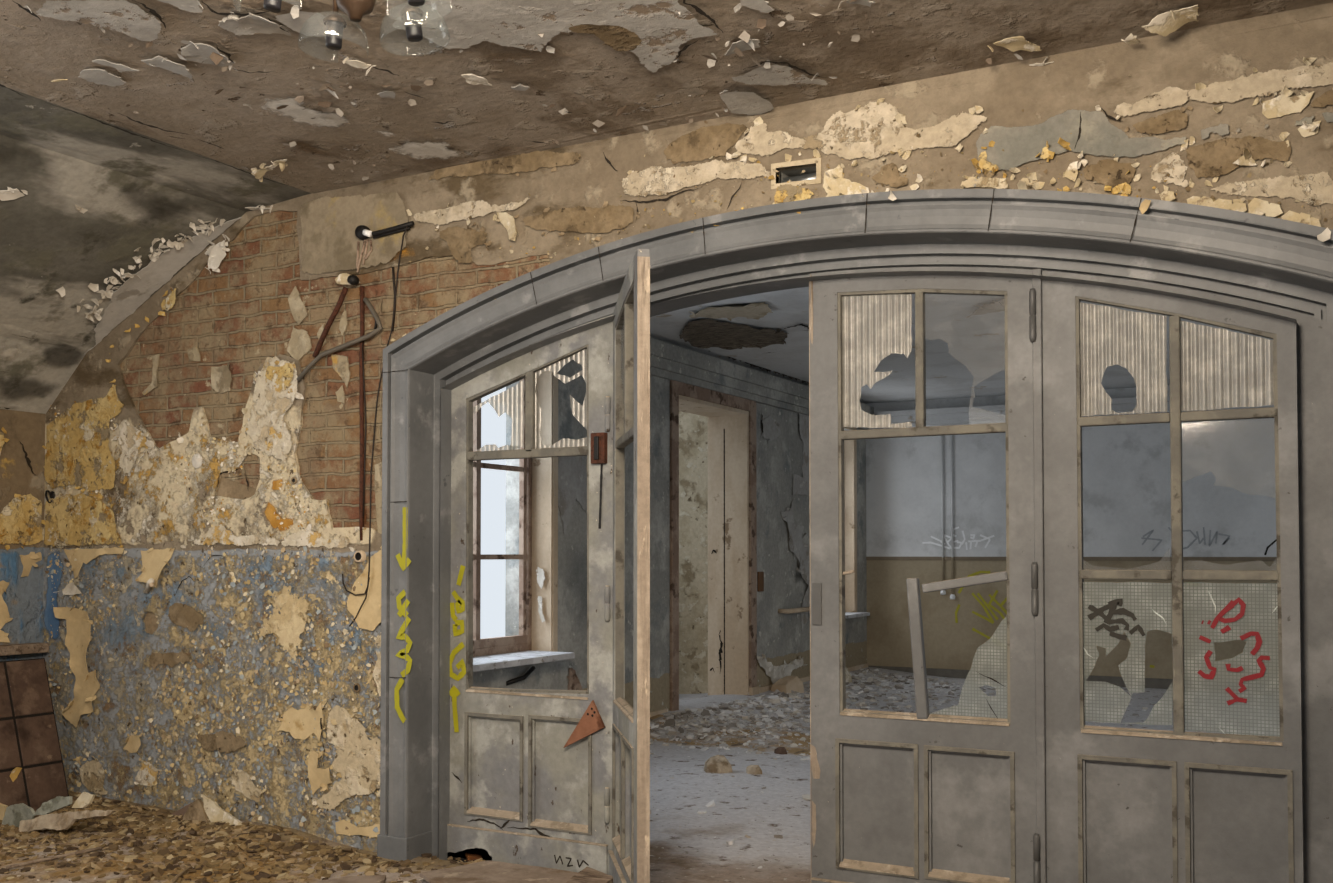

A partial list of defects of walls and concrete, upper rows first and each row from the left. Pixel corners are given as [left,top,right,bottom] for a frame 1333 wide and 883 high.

peeling [24,0,235,87]
peeling [218,5,326,39]
peeling [393,0,719,72]
peeling [734,0,774,13]
peeling [1121,5,1199,44]
water stain [46,346,80,365]
water stain [2,380,48,398]
spalling [0,36,1333,728]
peeling [197,726,246,754]
peeling [123,733,162,787]
peeling [228,770,267,802]
peeling [276,702,381,839]